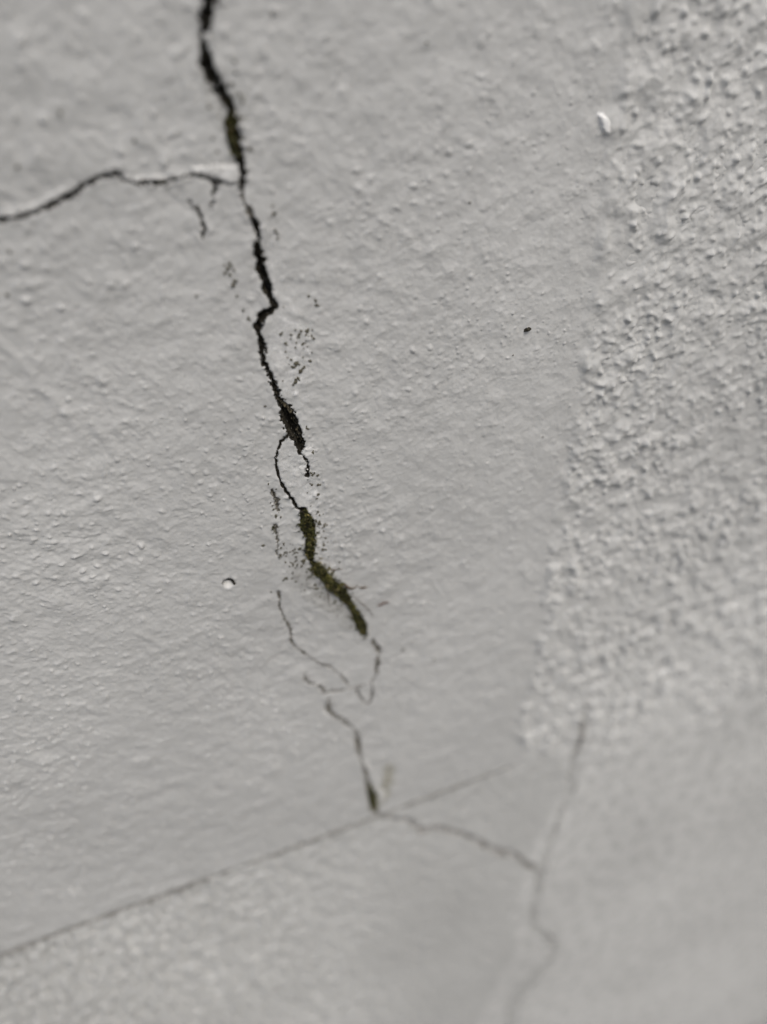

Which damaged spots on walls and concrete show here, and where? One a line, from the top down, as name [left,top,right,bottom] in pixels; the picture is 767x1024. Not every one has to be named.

crack [0,0,590,1021]